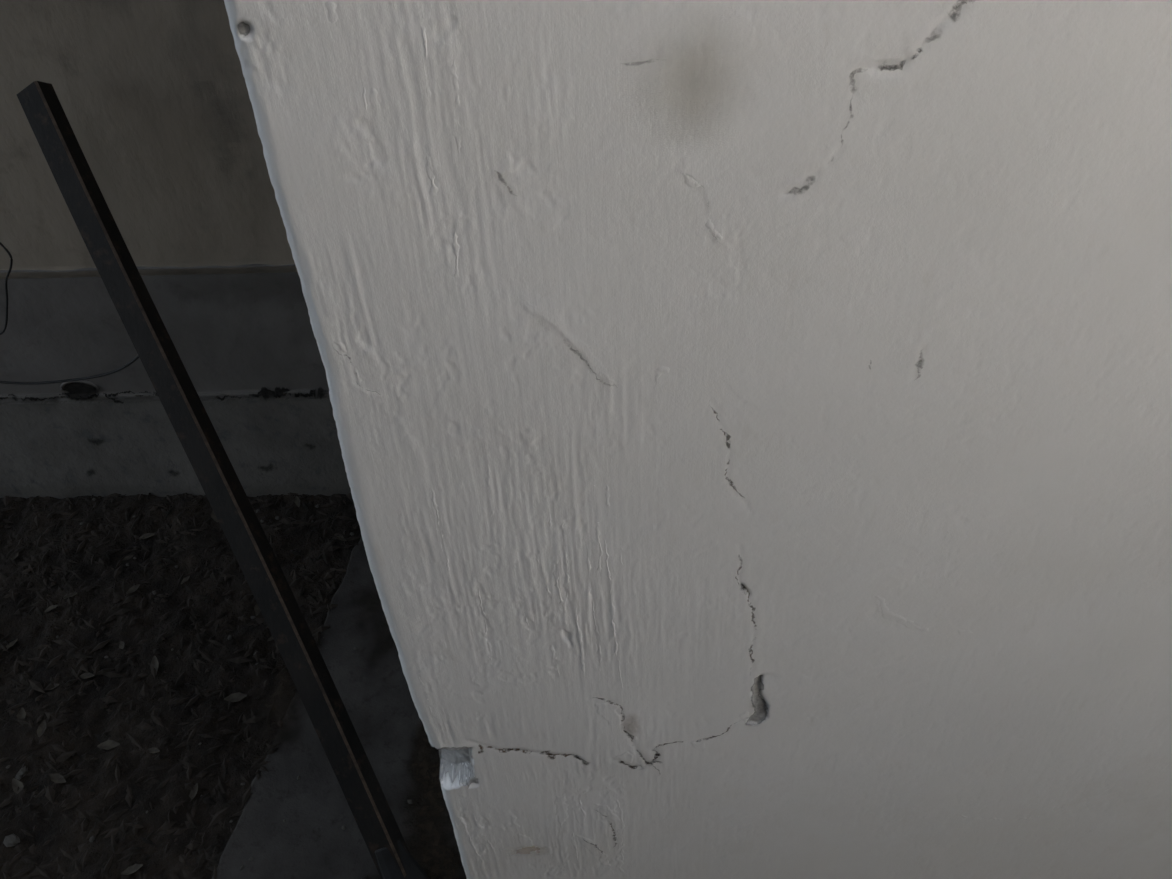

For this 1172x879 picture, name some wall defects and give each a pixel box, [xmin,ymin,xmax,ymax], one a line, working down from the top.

crack [846,2,965,127]
crack [714,410,743,497]
crack [735,559,756,661]
spalling [428,739,478,786]
crack [478,745,589,765]
crack [594,698,752,770]
spalling [746,675,767,725]